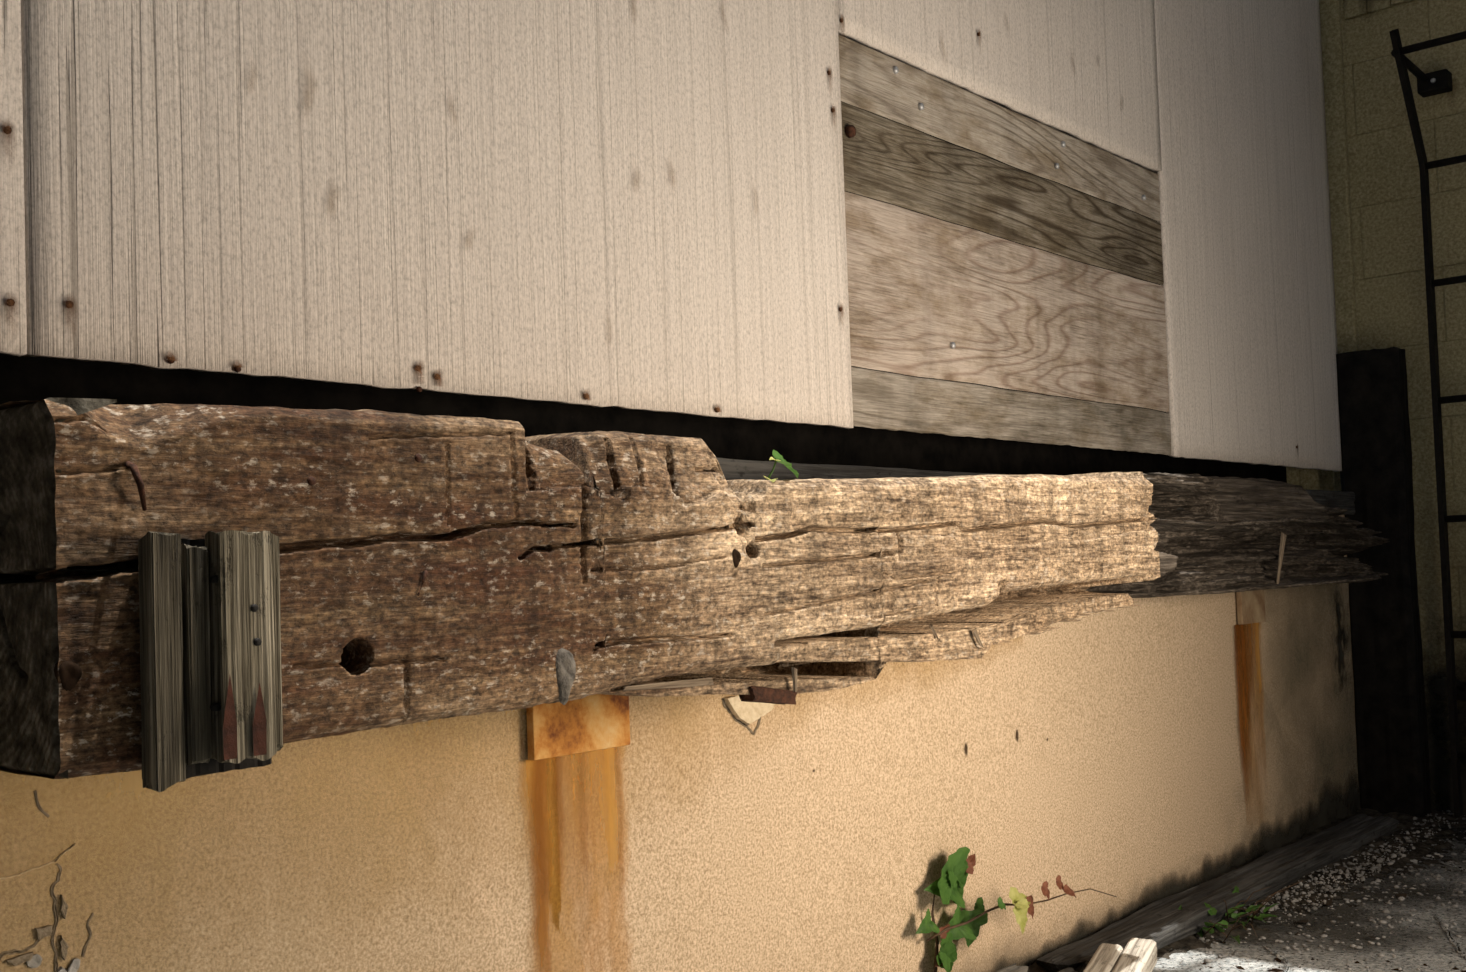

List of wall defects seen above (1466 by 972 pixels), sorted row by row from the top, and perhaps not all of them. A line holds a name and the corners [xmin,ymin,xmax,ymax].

corrosion [1235,622,1262,775]
crack [33,790,50,818]
crack [0,863,94,972]
corrosion [525,747,622,972]